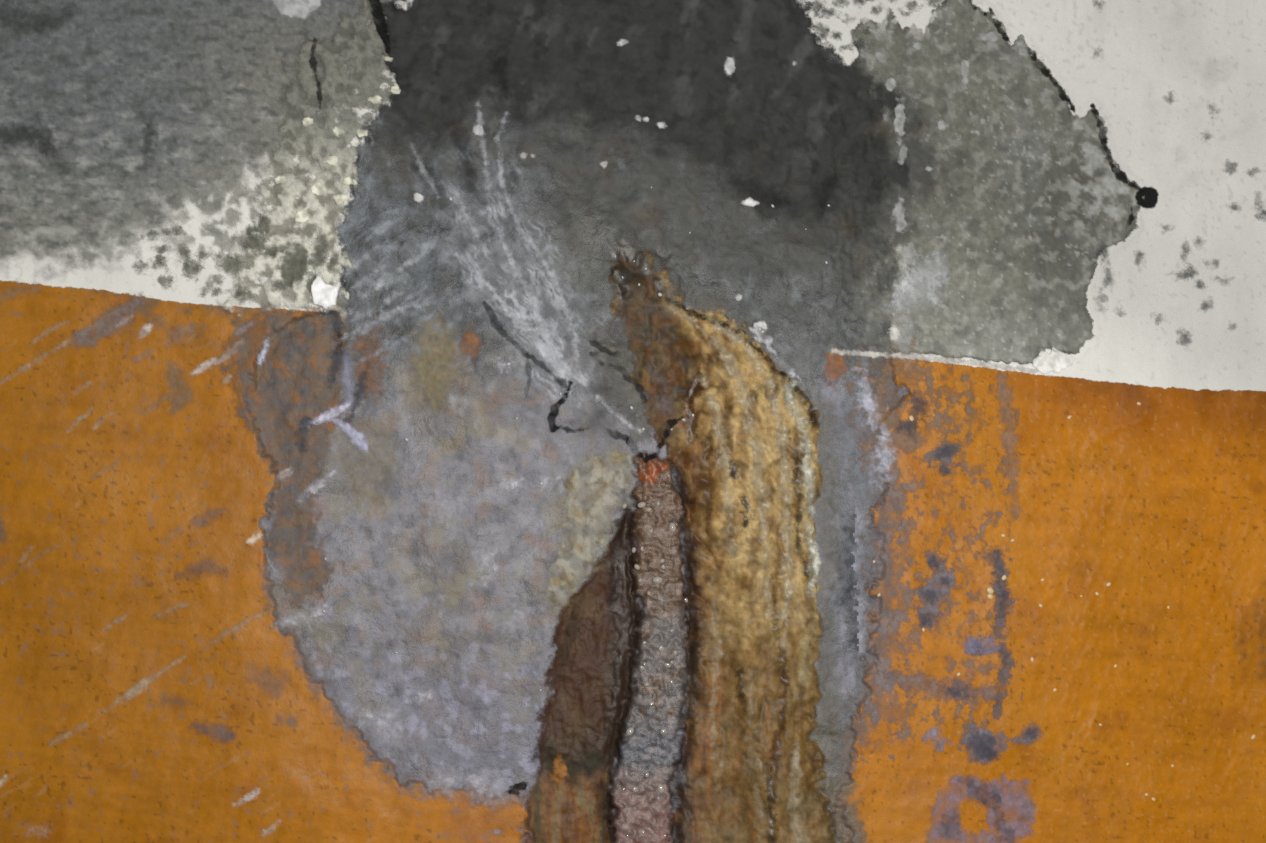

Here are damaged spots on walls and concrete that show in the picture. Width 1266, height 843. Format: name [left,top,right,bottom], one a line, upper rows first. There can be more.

damp [0,0,933,843]
crack [548,381,581,432]
spalling [217,0,1145,843]
damp [893,251,947,309]
corrosion [508,495,642,843]